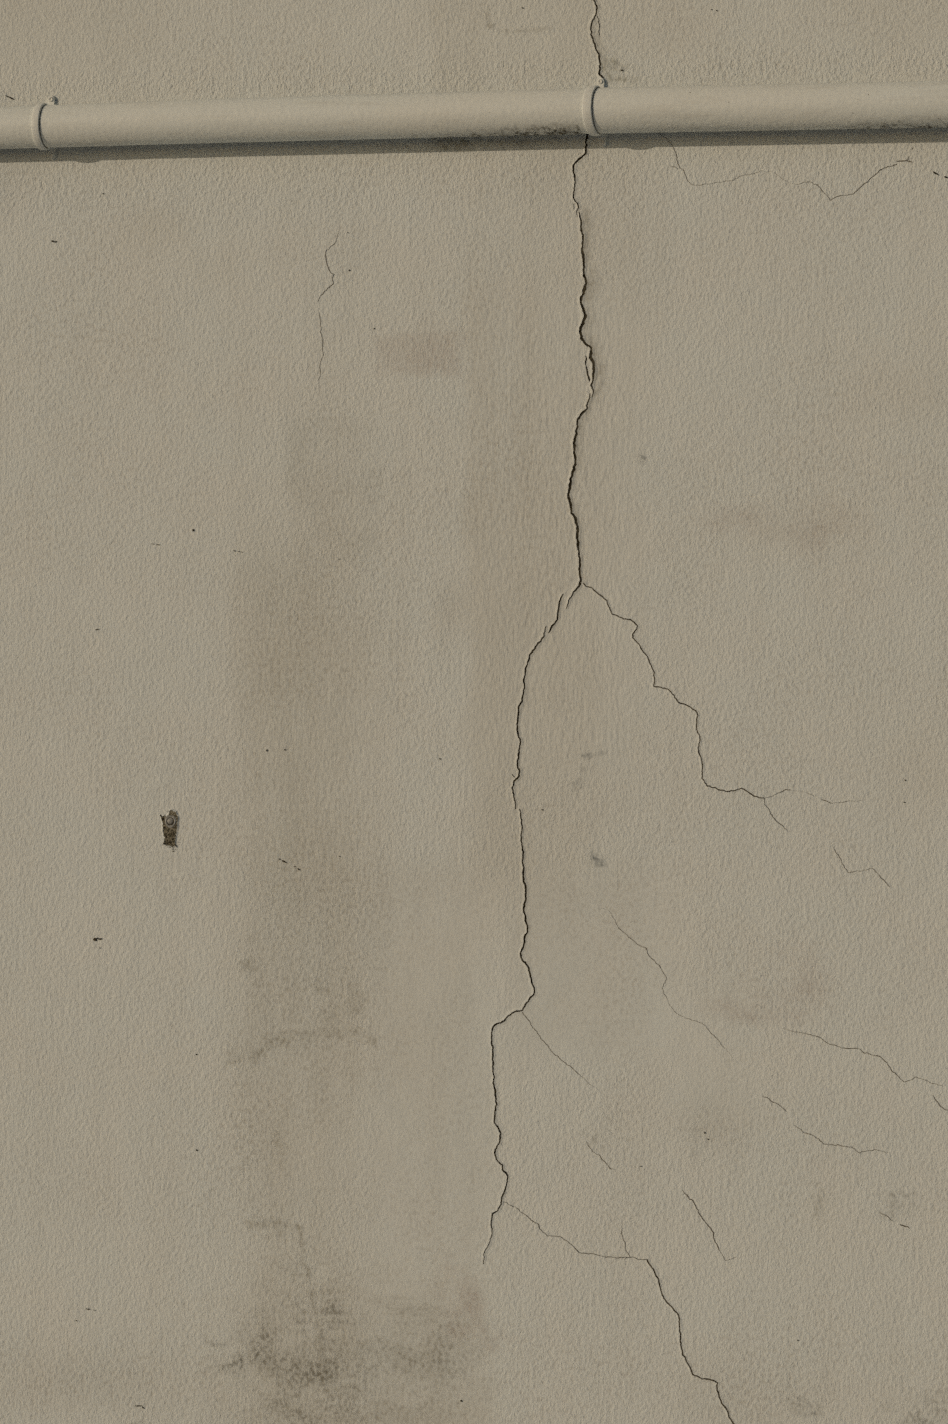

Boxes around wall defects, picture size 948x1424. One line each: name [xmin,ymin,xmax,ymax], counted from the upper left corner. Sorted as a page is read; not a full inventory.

crack [587,0,608,88]
crack [660,134,913,200]
crack [481,134,863,1424]
spalling [160,808,179,852]
crack [783,1028,945,1110]
crack [763,1096,888,1153]